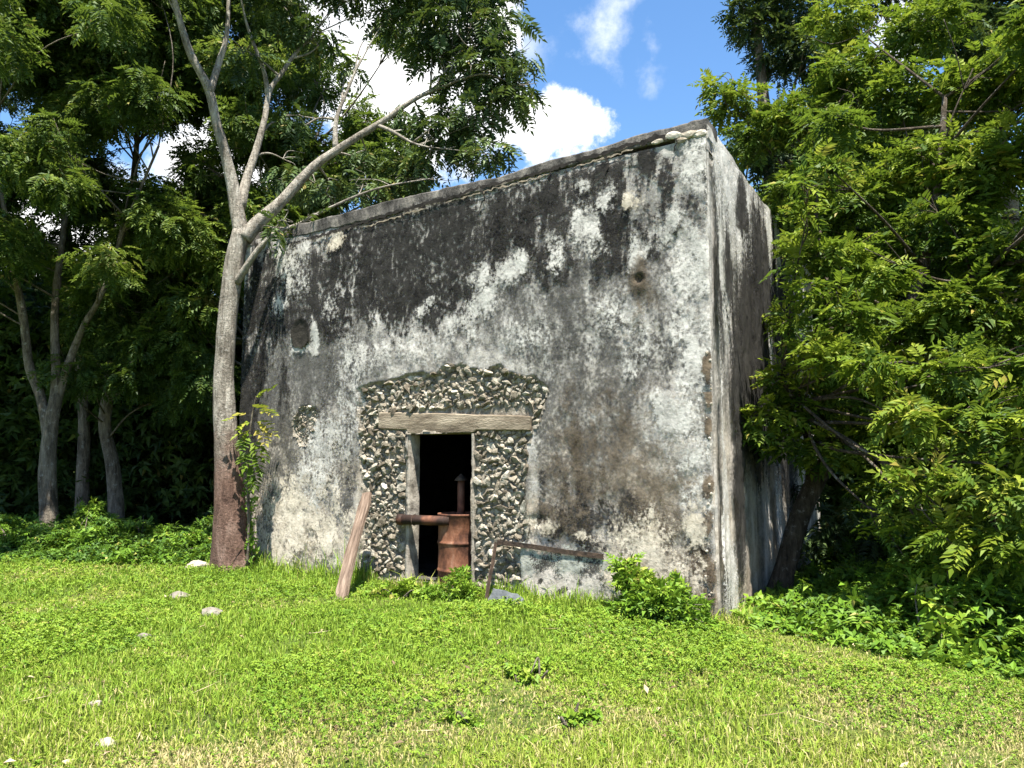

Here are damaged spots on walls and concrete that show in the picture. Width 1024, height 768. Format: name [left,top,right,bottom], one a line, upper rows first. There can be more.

spalling [245,136,772,609]
damp [239,147,800,614]